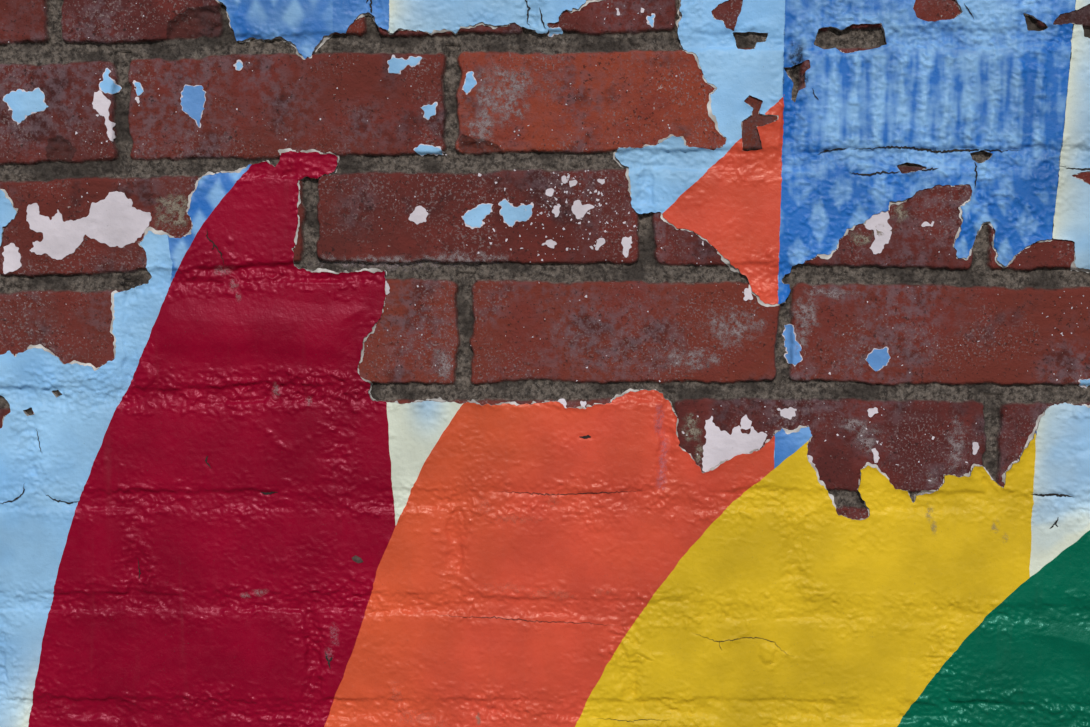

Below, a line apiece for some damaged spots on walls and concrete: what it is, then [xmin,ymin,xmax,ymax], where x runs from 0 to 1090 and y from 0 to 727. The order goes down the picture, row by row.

peeling [0,0,1090,520]